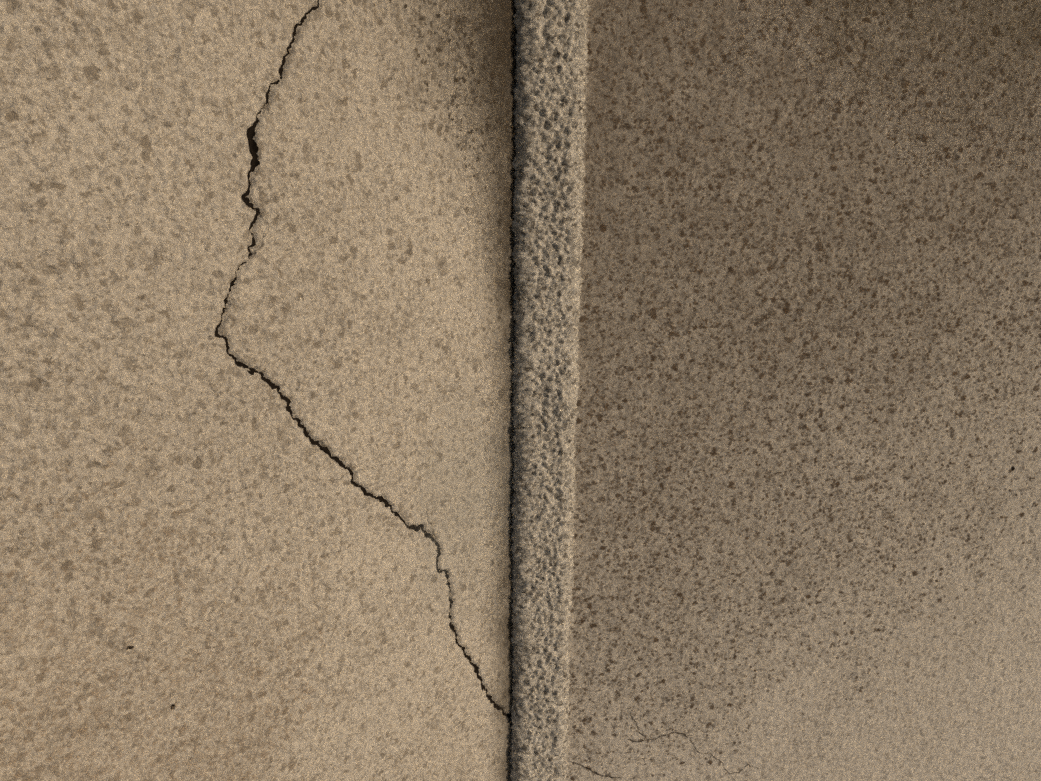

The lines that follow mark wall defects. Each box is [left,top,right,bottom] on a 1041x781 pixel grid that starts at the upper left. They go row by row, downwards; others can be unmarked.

crack [215,0,512,723]